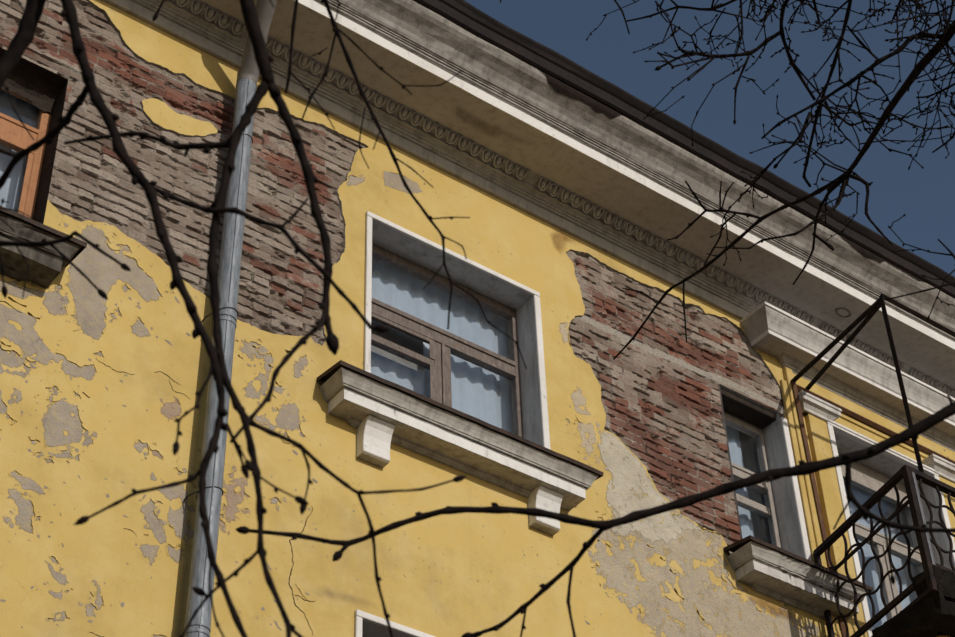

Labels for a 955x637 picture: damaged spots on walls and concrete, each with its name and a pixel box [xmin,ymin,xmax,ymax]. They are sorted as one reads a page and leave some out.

flaking render [0,0,235,463]
flaking render [235,108,368,461]
flaking render [559,249,819,637]
peeling [4,469,48,541]
peeling [30,555,73,599]
peeling [79,580,105,622]
peeling [135,466,197,578]
peeling [219,466,250,533]